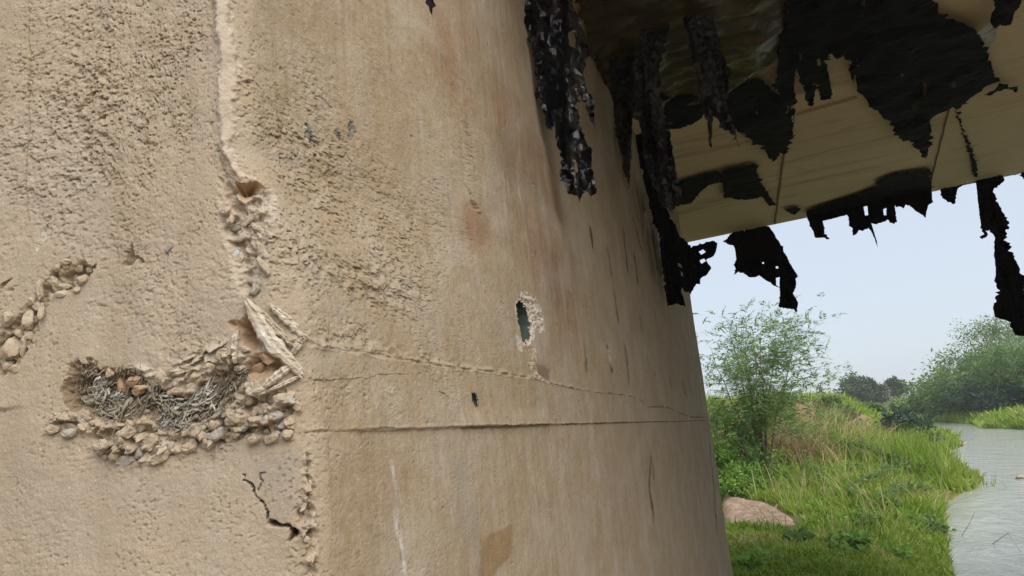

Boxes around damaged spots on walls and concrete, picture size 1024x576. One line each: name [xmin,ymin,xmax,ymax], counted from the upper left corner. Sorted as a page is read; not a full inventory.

spalling [43,0,308,468]
peeling [36,280,45,321]
spalling [514,290,545,346]
crack [308,373,409,383]
crack [460,379,706,430]
crack [242,472,300,542]
spalling [294,451,319,576]
water stain [482,527,511,576]